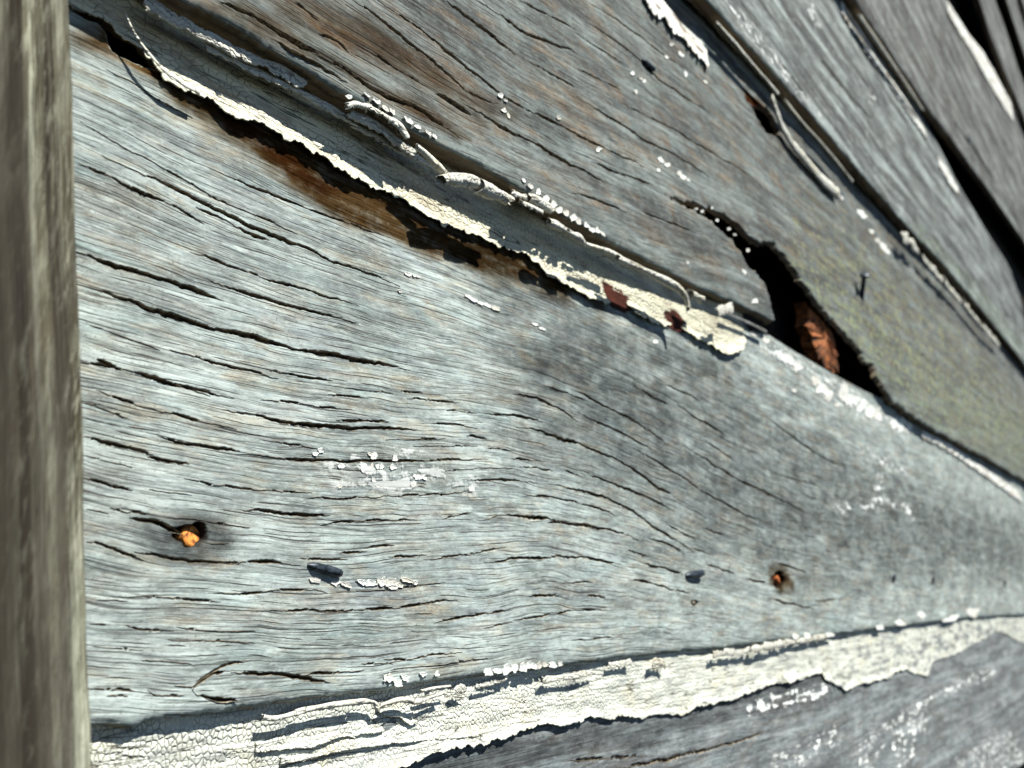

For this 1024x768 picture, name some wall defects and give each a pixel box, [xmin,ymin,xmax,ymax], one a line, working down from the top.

crack [80,121,401,287]
peeling [68,0,1021,502]
crack [79,252,842,703]
peeling [309,576,418,590]
corrosion [771,569,793,592]
peeling [90,608,1024,768]